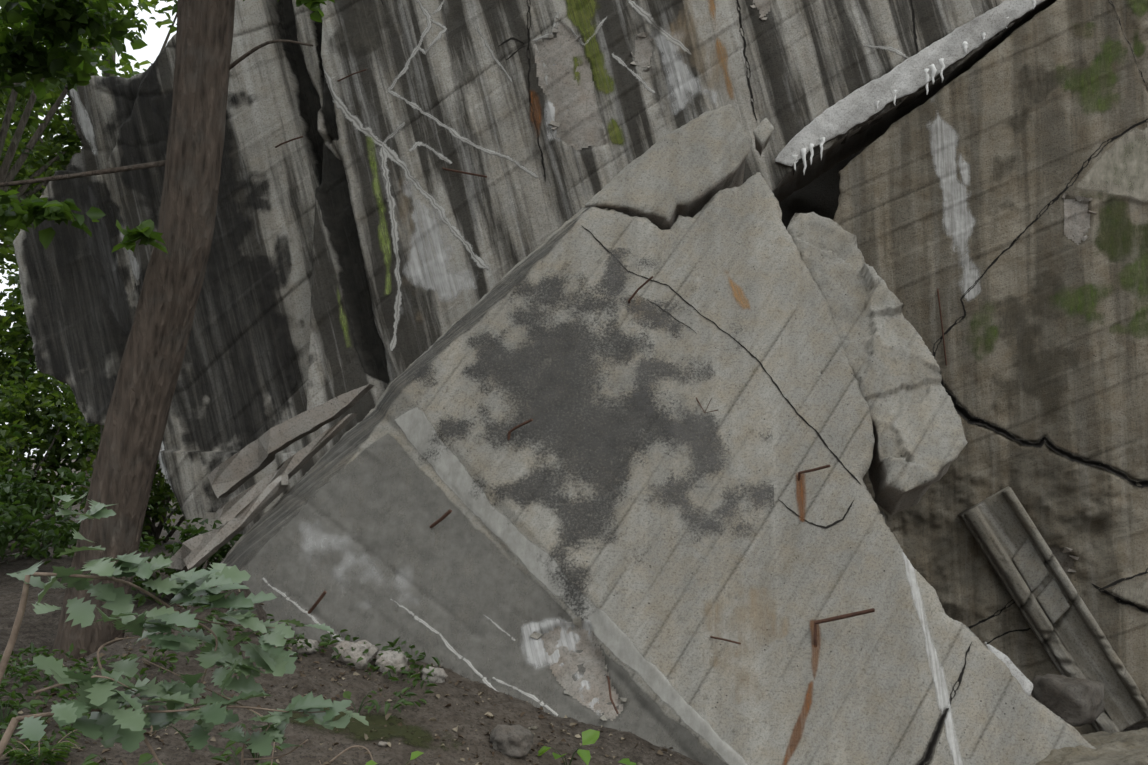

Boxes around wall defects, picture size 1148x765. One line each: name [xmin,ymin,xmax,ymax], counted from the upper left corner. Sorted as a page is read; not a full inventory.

crack [736,0,757,121]
leakage [1078,128,1148,201]
leakage [172,92,311,512]
crack [933,119,1148,488]
leakage [223,0,774,765]
crack [581,225,860,529]
rust [796,473,805,521]
crack [1092,568,1148,613]
spalling [530,616,627,721]
rust [783,620,820,765]
crack [917,599,1031,765]